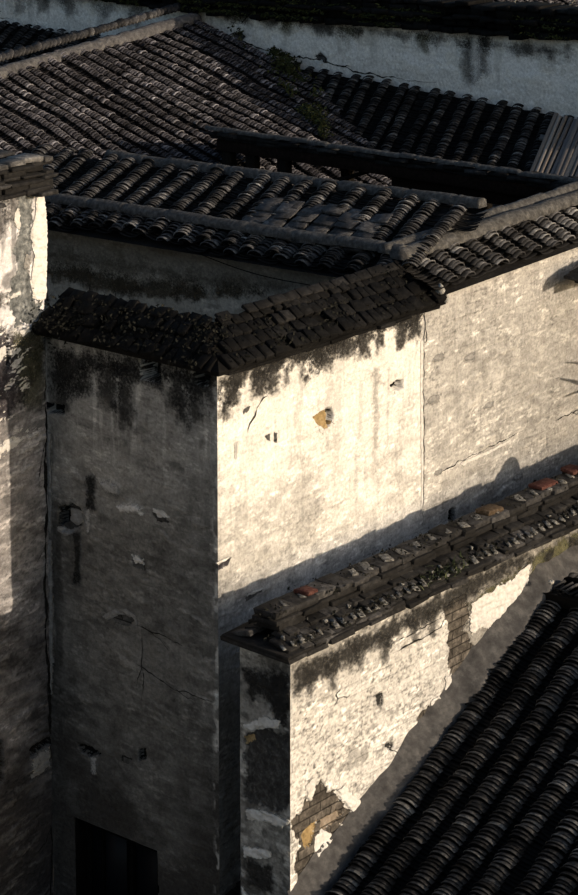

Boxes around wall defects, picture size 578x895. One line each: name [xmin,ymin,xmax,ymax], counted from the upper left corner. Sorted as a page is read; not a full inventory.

damp [212,7,572,82]
damp [14,313,423,431]
spalling [313,409,337,434]
crack [420,313,522,525]
crack [37,380,52,759]
crack [135,625,211,702]
damp [241,533,578,727]
spalling [242,715,361,878]
damp [244,858,274,894]